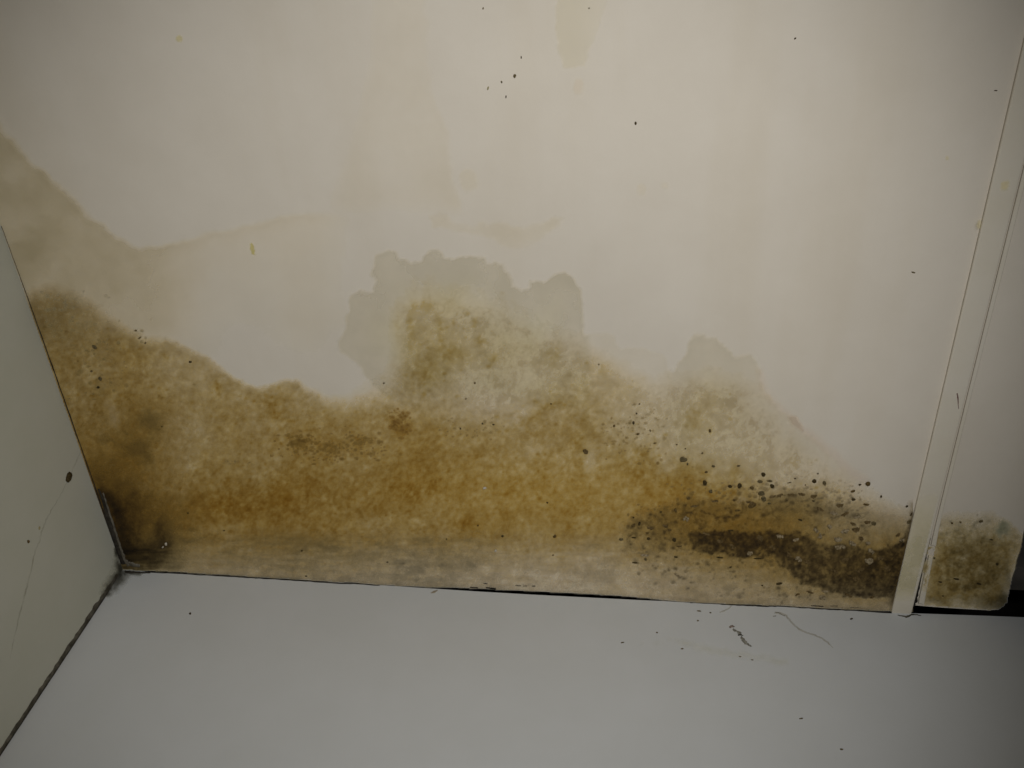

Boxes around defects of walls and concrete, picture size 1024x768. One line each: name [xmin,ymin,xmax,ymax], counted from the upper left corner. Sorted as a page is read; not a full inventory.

damp [270,408,412,465]
damp [602,403,689,465]
damp [85,409,204,571]
damp [221,537,498,587]
damp [619,465,913,610]
damp [925,518,1021,610]